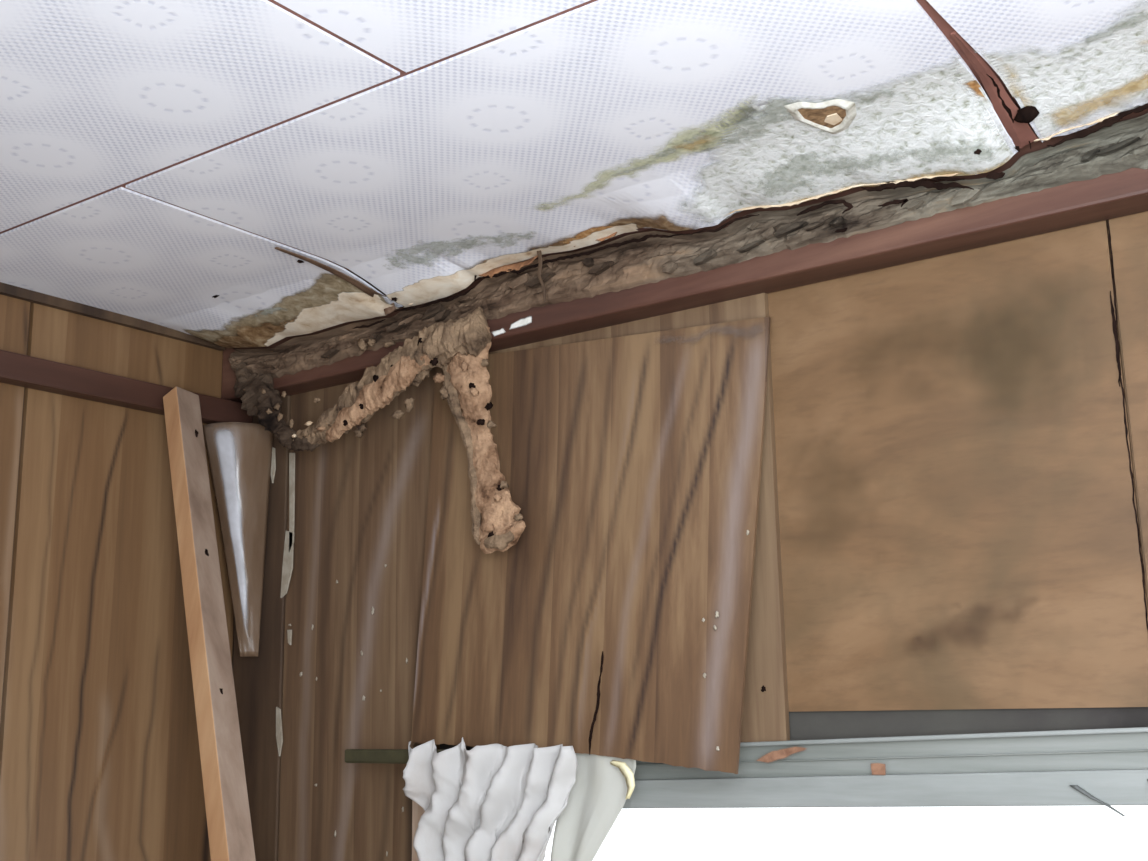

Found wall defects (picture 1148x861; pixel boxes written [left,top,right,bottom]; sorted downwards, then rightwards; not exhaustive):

damp [983,1,1148,139]
spalling [784,99,857,134]
damp [389,60,1014,266]
peeling [1081,136,1141,163]
peeling [951,188,982,207]
peeling [736,216,845,253]
peeling [582,257,615,275]
peeling [275,247,474,351]